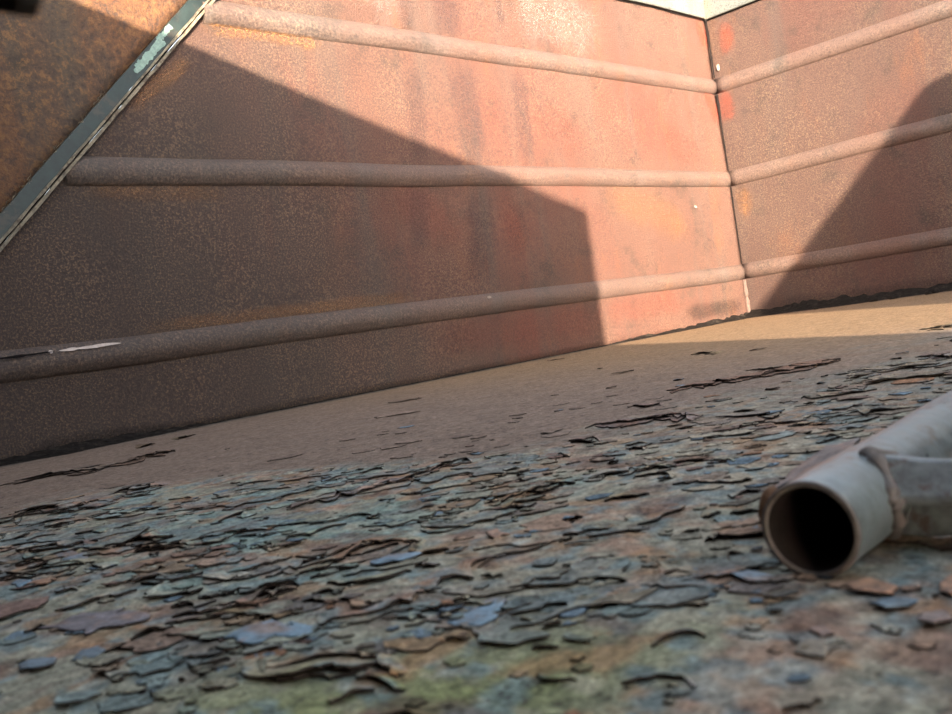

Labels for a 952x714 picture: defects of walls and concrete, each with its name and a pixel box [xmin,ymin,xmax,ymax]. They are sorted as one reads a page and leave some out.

rust [919,322,952,331]
rust [915,340,952,360]
rust [667,358,841,394]
rust [801,389,877,398]
rust [555,402,703,457]
rust [286,457,473,508]
rust [638,534,774,589]
rust [0,481,614,704]
rust [845,574,952,625]
rust [650,628,706,648]
rust [621,673,696,689]
rust [782,698,822,712]